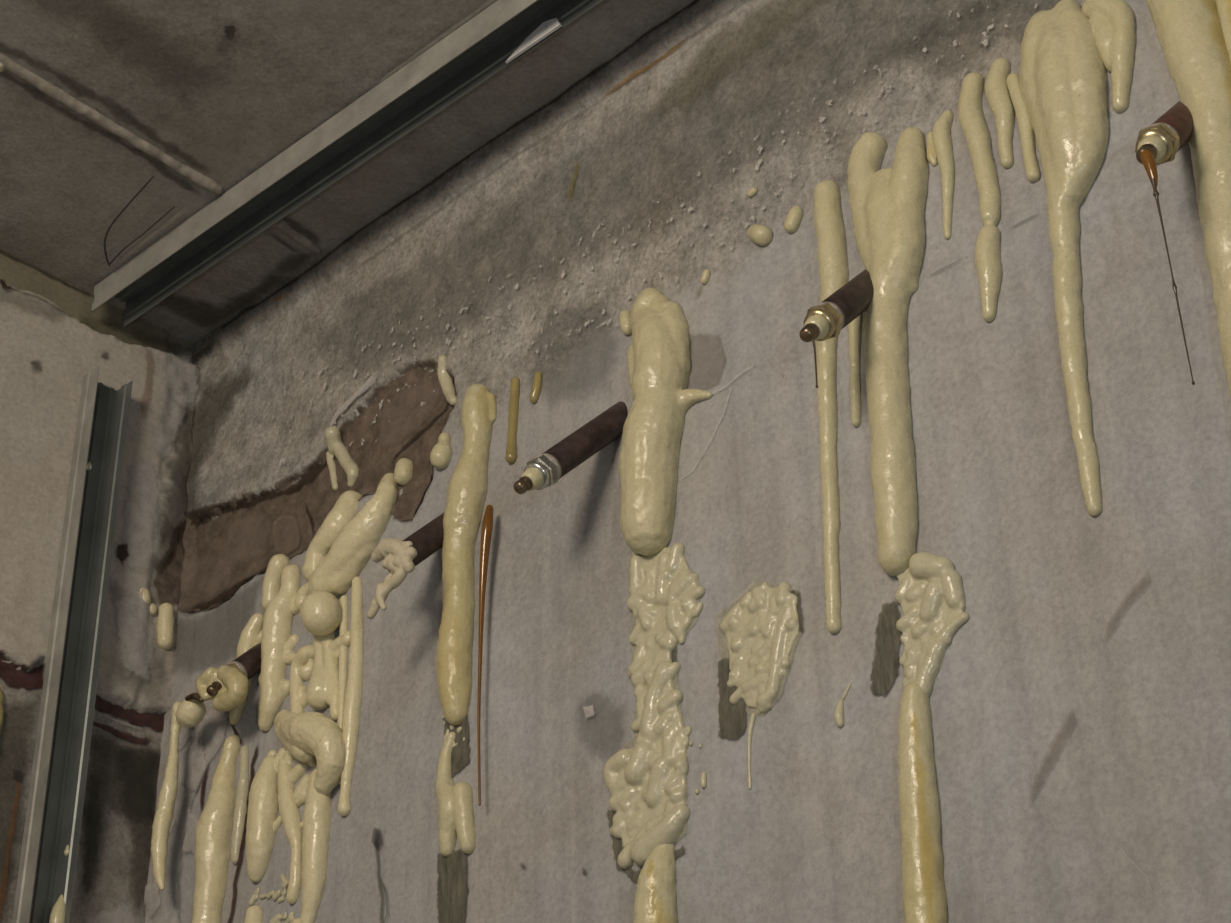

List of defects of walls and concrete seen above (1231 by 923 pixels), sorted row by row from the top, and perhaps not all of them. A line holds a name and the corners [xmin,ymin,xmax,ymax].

water stain [222,0,699,328]
spalling [153,360,457,613]
water stain [251,305,472,437]
water stain [486,259,616,359]